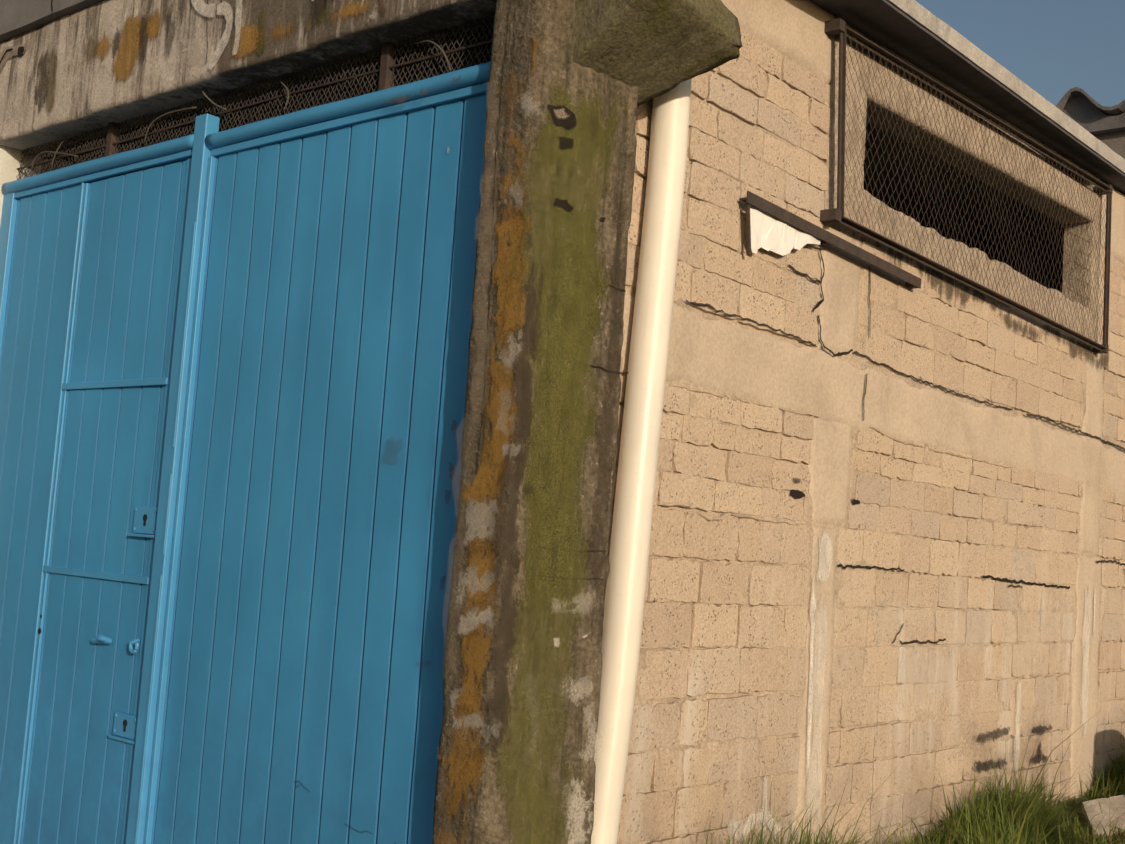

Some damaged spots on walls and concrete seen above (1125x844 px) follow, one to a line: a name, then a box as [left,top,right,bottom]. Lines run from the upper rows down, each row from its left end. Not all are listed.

leakage [112,31,121,58]
leakage [139,16,148,57]
leakage [34,49,57,113]
spalling [553,198,574,212]
crack [686,248,1125,451]
peeling [437,129,531,823]
leakage [486,190,624,765]
crack [838,563,904,571]
crack [983,575,1070,589]
crack [892,624,946,645]
leakage [974,683,1053,775]
leakage [563,779,593,844]